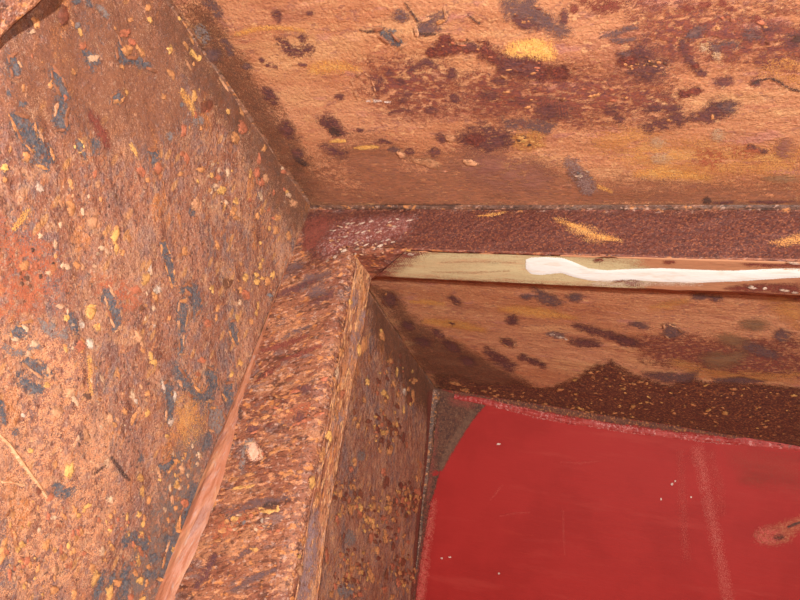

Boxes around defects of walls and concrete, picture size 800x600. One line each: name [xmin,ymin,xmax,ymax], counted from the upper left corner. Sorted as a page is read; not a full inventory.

corrosion [0,0,800,325]
corrosion [0,178,209,600]
corrosion [230,437,281,490]
corrosion [250,377,325,429]
corrosion [261,324,322,362]
corrosion [329,282,800,600]
corrosion [192,494,291,592]
corrosion [282,470,329,600]